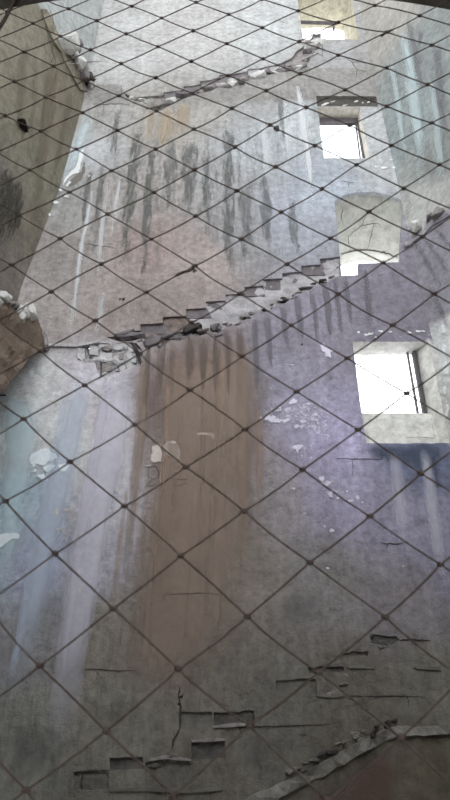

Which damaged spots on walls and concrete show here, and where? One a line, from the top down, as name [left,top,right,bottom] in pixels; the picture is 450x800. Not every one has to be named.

leakage [297,90,312,183]
leakage [72,204,90,312]
leakage [114,134,155,251]
leakage [223,132,235,259]
crack [341,211,393,257]
leakage [310,280,351,334]
leakage [7,404,31,525]
peeling [29,448,69,479]
peeling [260,398,334,437]
leakage [66,396,125,645]
crack [172,689,184,747]
flaking render [246,718,450,800]